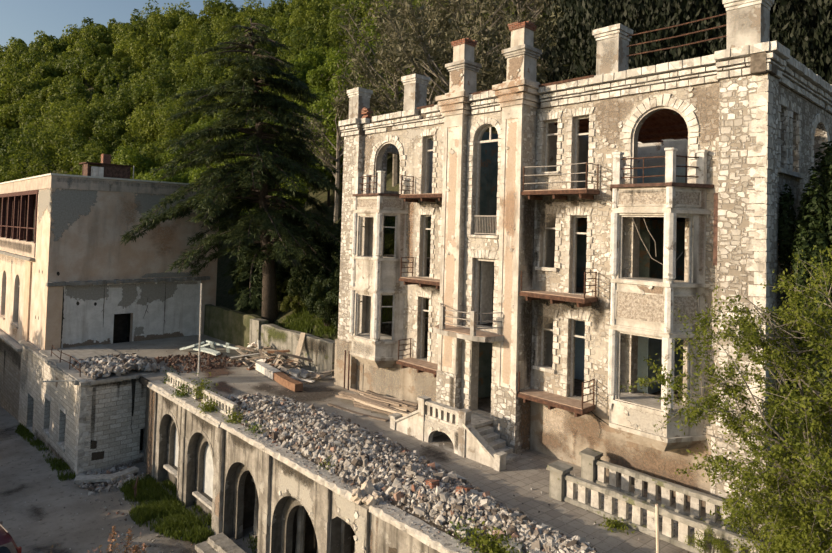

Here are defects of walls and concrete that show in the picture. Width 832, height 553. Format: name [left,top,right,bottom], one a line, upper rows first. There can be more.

peeling [38,188,97,241]
flaking render [118,281,178,309]
flaking render [63,338,111,348]
flaking render [134,327,184,341]
damp [520,400,531,450]
damp [540,410,602,449]
damp [607,444,700,503]